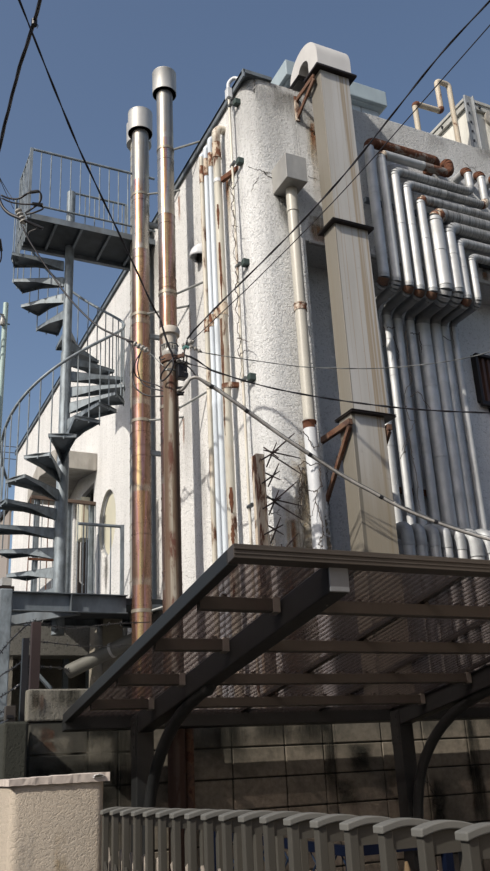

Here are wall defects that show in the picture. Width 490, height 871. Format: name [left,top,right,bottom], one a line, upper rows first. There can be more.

leakage [431,784,445,820]
leakage [464,720,486,808]